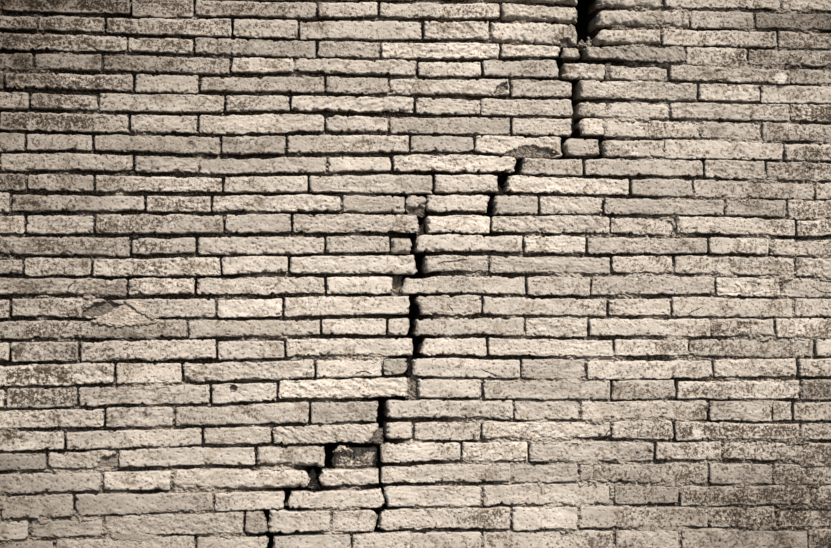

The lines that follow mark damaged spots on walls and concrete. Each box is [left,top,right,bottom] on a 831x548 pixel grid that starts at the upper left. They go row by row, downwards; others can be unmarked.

crack [555,0,612,160]
crack [484,158,522,235]
crack [264,174,467,548]